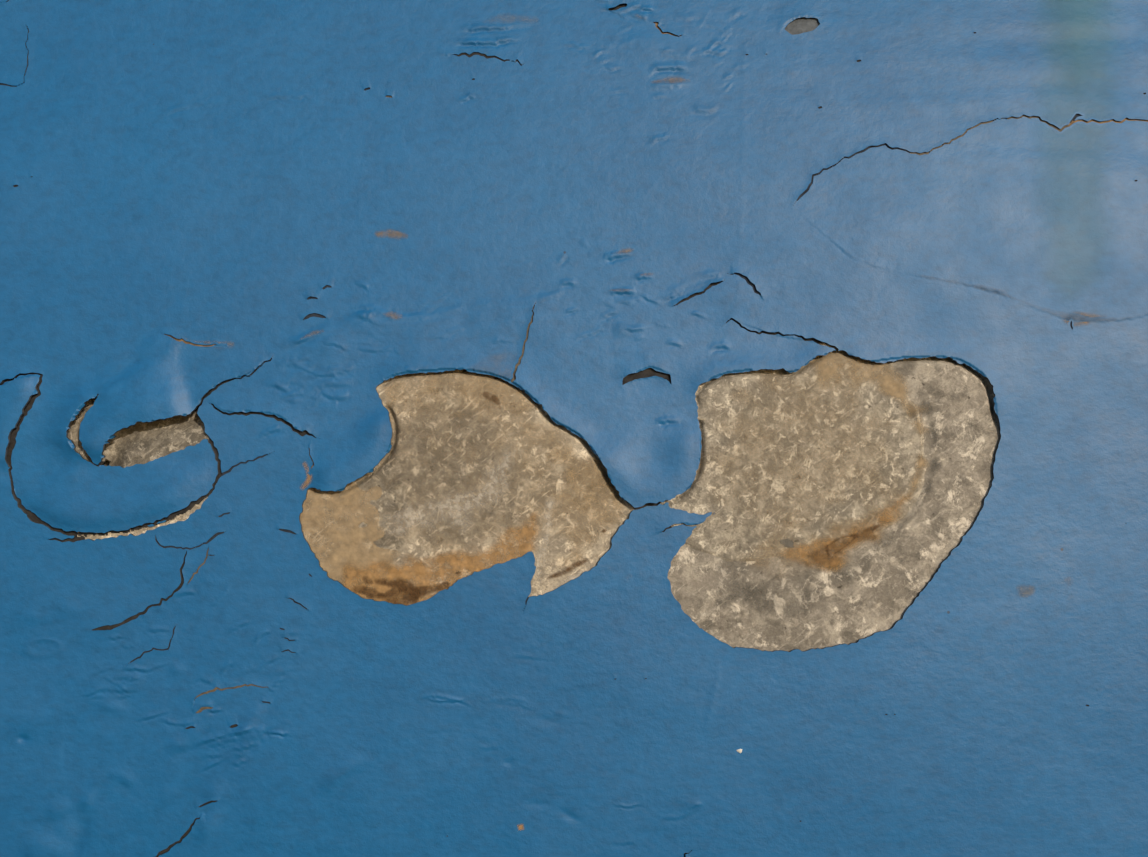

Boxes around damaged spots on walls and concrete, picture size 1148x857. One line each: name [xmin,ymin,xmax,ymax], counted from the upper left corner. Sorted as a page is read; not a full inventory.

crack [0,28,29,87]
peeling [785,17,820,35]
crack [793,114,1148,330]
peeling [0,318,1001,652]
crack [92,512,230,696]
crack [155,800,217,857]